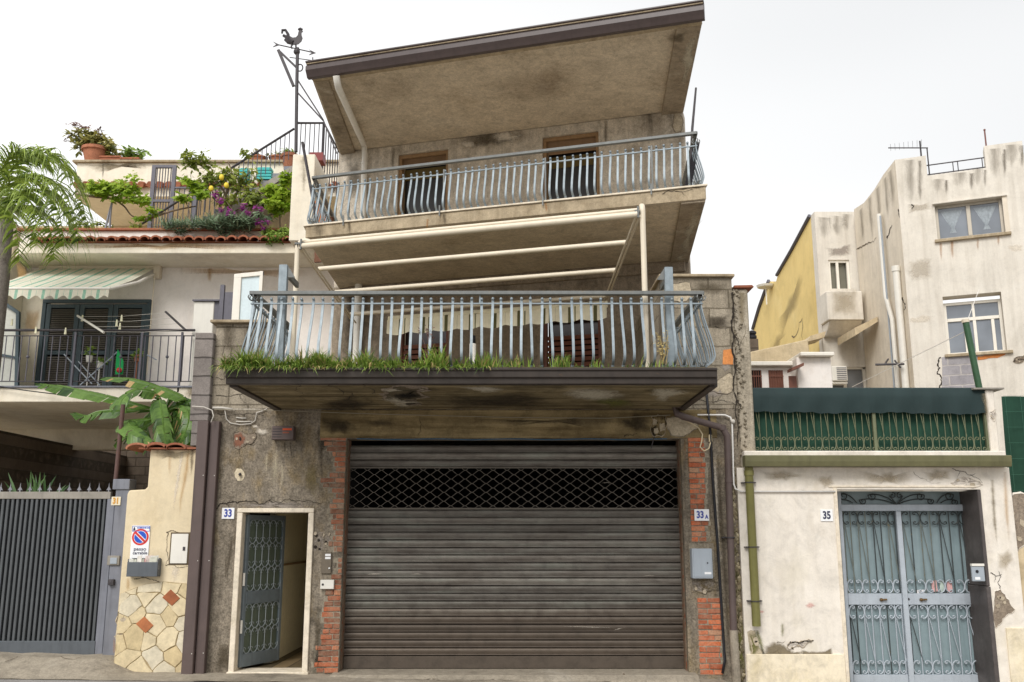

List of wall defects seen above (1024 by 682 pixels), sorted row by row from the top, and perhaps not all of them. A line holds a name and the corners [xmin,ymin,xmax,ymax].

damp [462,387,531,407]
damp [574,391,618,399]
damp [655,390,681,399]
crack [702,287,748,682]
crack [217,498,321,509]
spalling [993,572,1015,628]